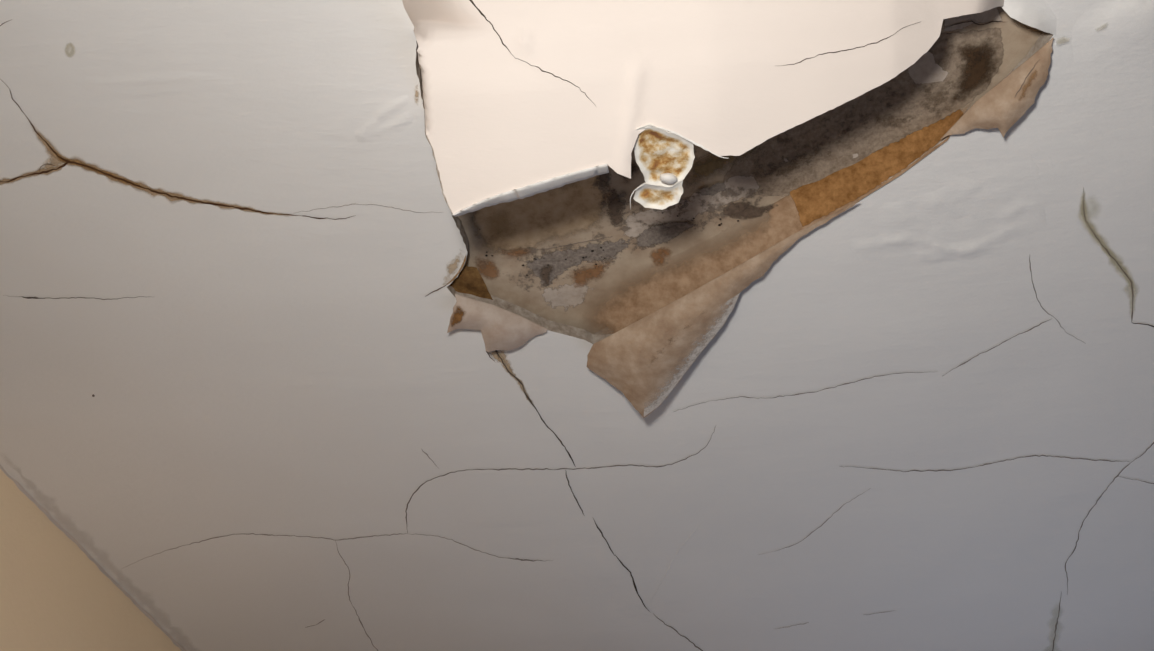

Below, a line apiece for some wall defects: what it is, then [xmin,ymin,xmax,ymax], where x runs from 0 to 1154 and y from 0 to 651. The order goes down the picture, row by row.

crack [9,294,144,302]
crack [0,79,441,220]
peeling [447,294,547,352]
flaking render [472,175,608,253]
flaking render [542,282,593,311]
water stain [507,133,822,290]
flaking render [623,7,1054,237]
crack [1083,188,1154,327]
crack [126,256,1083,651]
crack [759,442,1154,651]